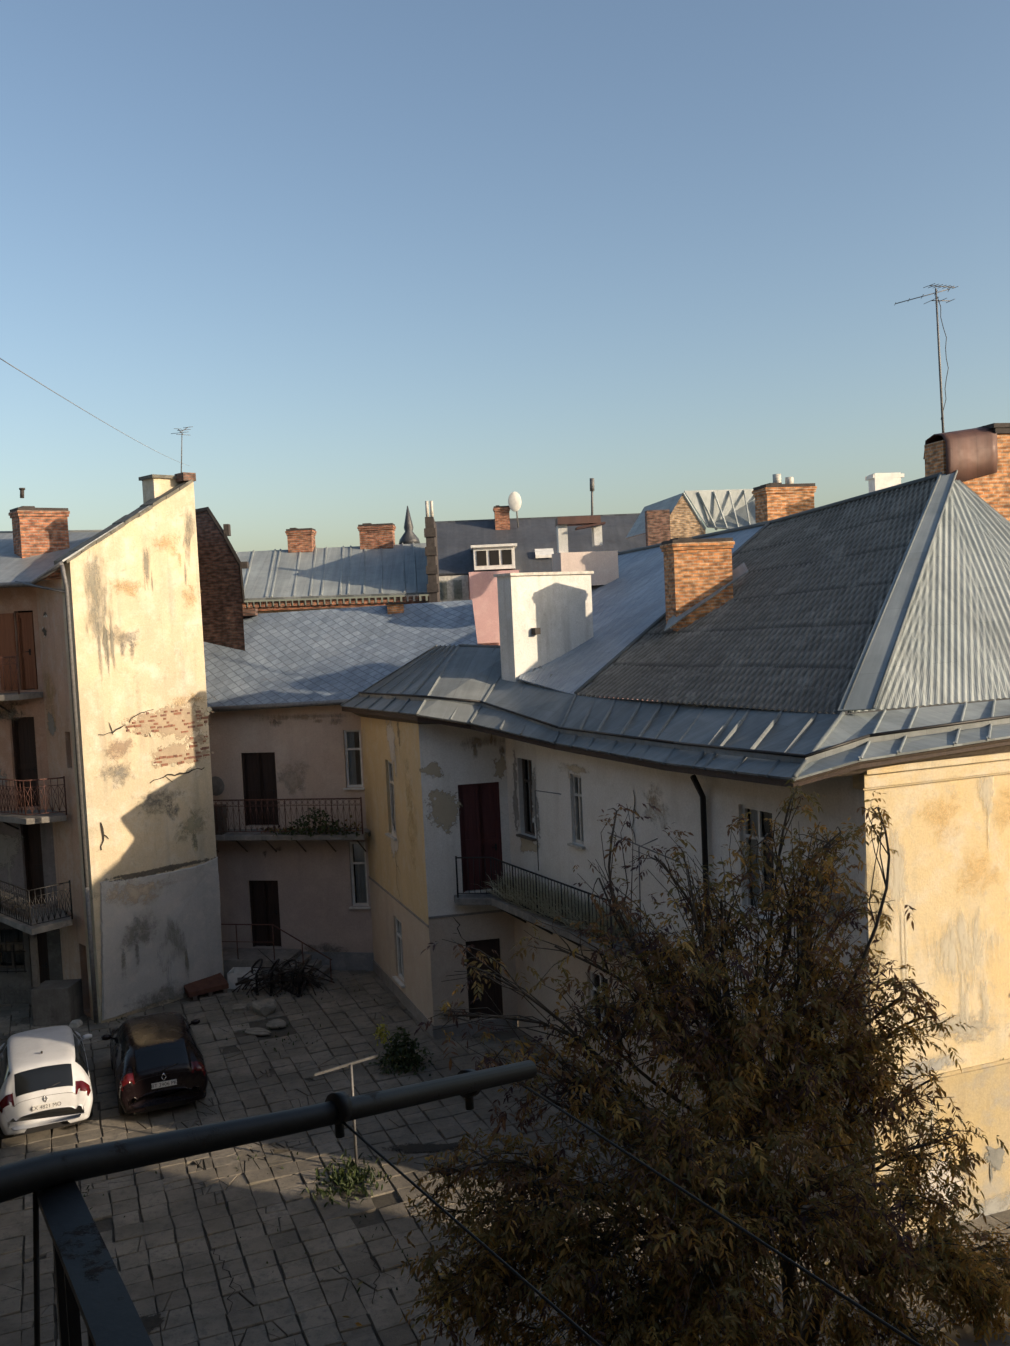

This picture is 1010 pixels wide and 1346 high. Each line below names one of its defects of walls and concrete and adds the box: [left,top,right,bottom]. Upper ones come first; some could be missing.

leakage [118,553,153,591]
leakage [87,559,134,666]
flaking render [121,704,214,769]
flaking render [419,761,462,834]
leakage [928,915,993,1042]
leakage [902,1056,951,1080]